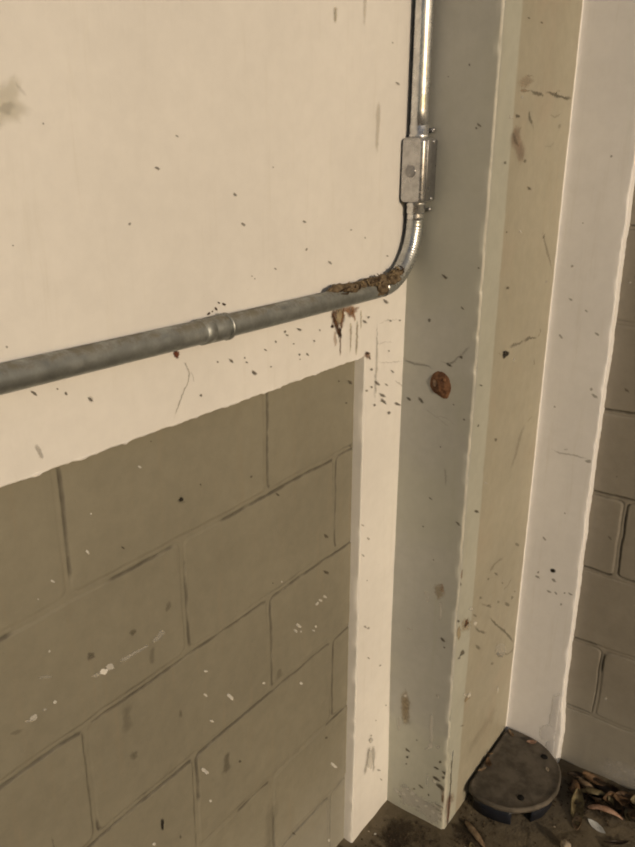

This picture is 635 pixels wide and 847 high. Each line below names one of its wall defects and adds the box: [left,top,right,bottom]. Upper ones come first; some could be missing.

corrosion [331,307,358,353]
corrosion [430,371,451,399]